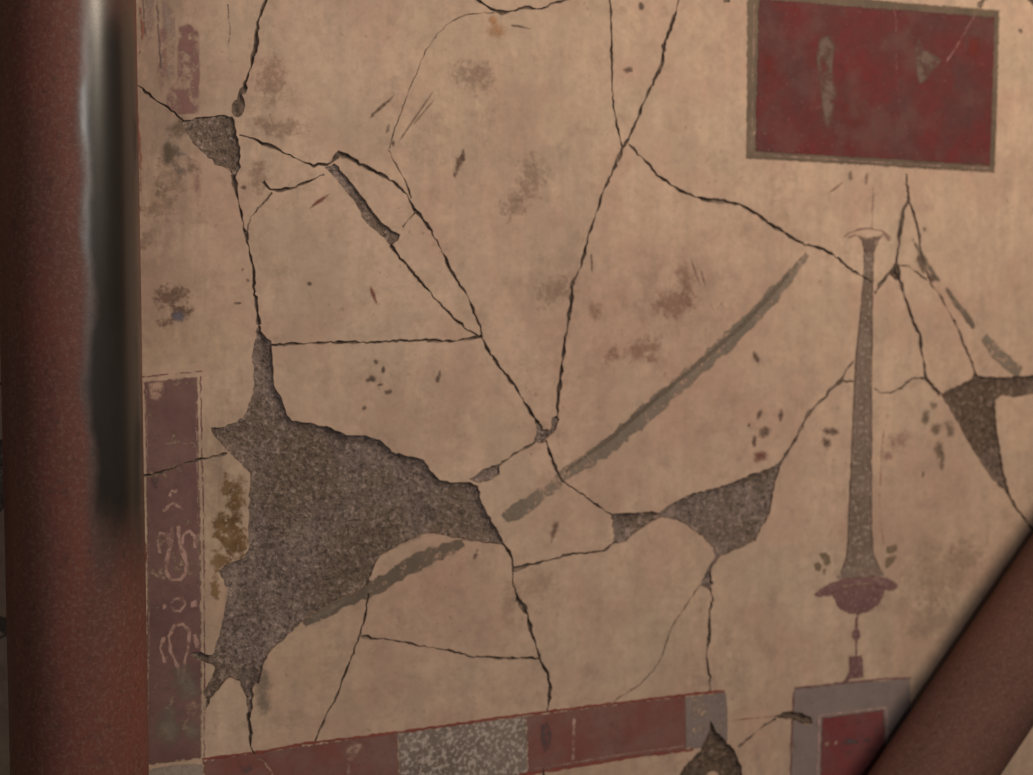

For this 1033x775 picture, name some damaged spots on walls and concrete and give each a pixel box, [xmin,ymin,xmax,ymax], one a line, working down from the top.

crack [138,85,183,121]
flaking render [182,115,241,176]
flaking render [324,164,400,247]
crack [231,0,975,516]
flaking render [941,372,1033,495]
flaking render [191,322,503,721]
flaking render [611,464,779,589]
crack [1007,492,1033,531]
crack [314,542,615,741]
crack [608,585,714,705]
crack [246,712,273,775]
flaking render [680,722,741,775]